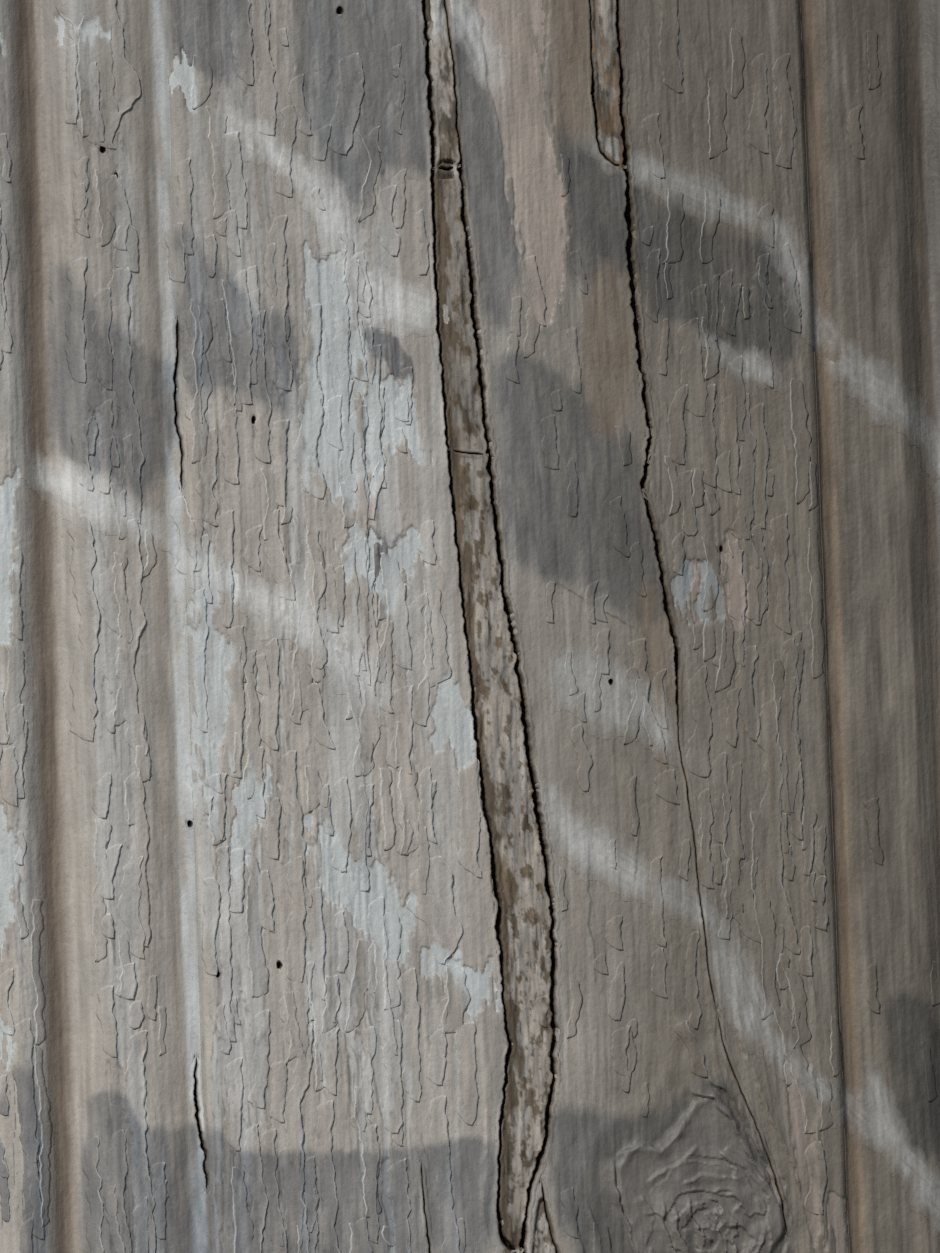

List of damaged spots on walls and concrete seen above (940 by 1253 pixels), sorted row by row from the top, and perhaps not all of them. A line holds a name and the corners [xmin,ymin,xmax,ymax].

peeling [0,208,13,370]
peeling [0,471,53,1253]
peeling [55,0,169,1253]
peeling [227,0,429,276]
peeling [164,49,499,1253]
crack [417,0,564,1253]
peeling [478,0,588,383]
peeling [533,996,550,1028]
peeling [564,581,610,792]
peeling [592,915,650,1117]
crack [585,0,791,1237]
peeling [624,113,848,1253]